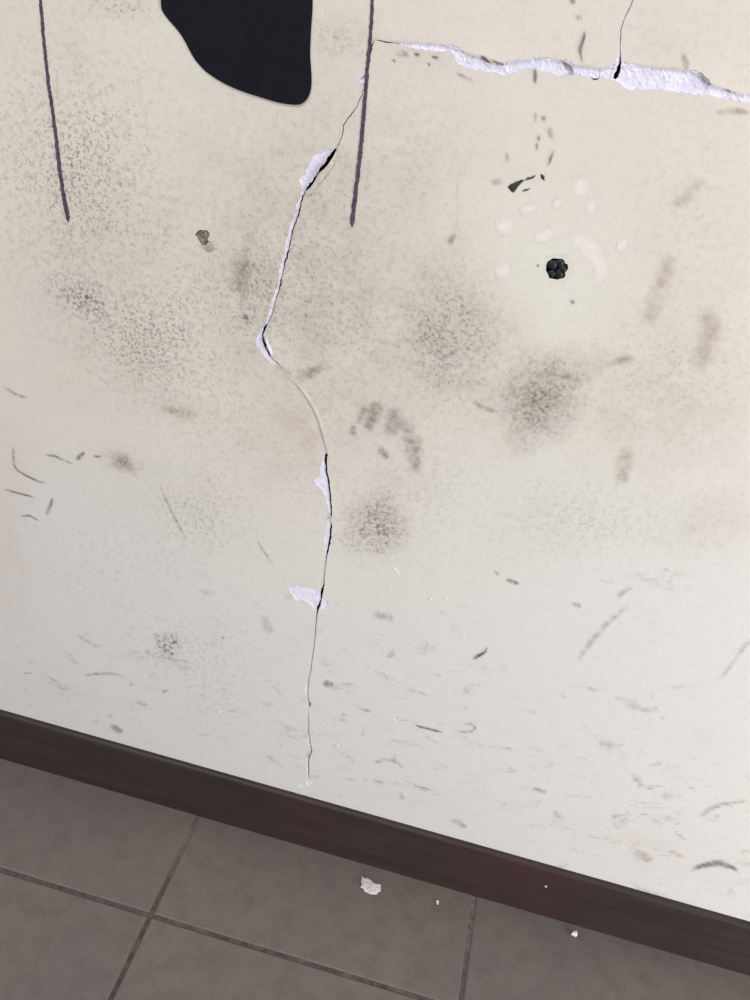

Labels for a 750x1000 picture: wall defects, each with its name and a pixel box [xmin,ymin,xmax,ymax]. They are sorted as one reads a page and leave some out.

peeling [366,40,750,103]
crack [610,0,633,80]
spalling [299,149,333,190]
crack [256,89,364,788]
spalling [314,453,331,516]
spalling [289,585,328,610]